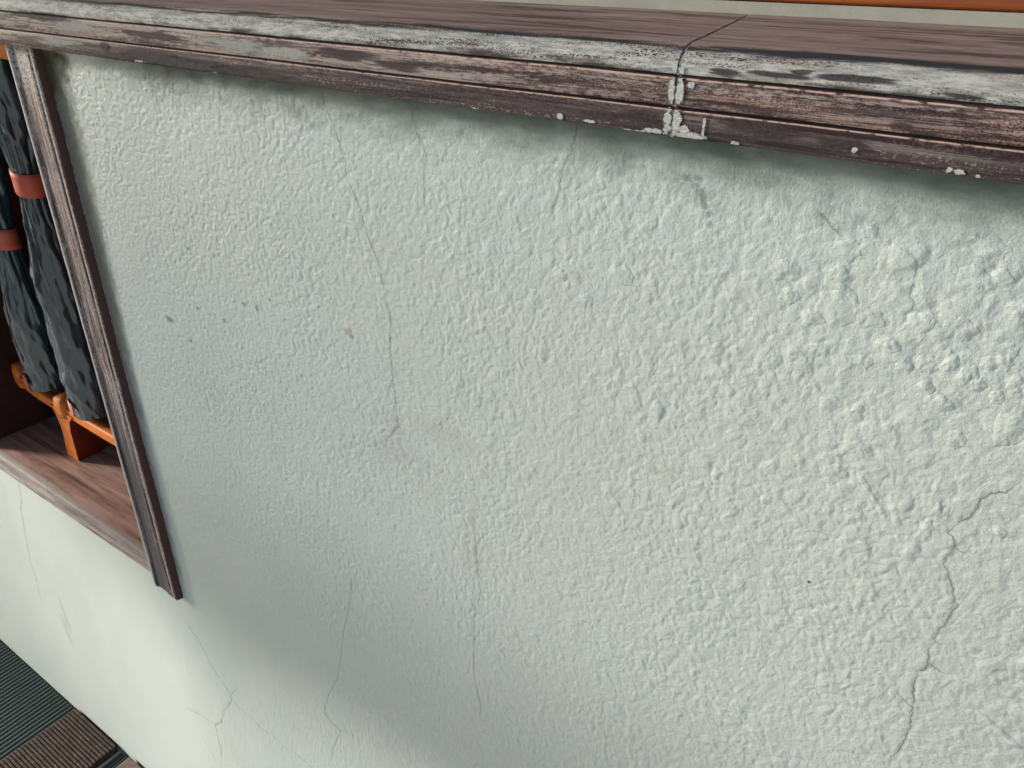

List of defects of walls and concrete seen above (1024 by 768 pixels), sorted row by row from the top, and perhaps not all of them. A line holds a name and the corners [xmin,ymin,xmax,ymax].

peeling [583,63,707,140]
peeling [726,120,874,153]
crack [893,487,1013,756]